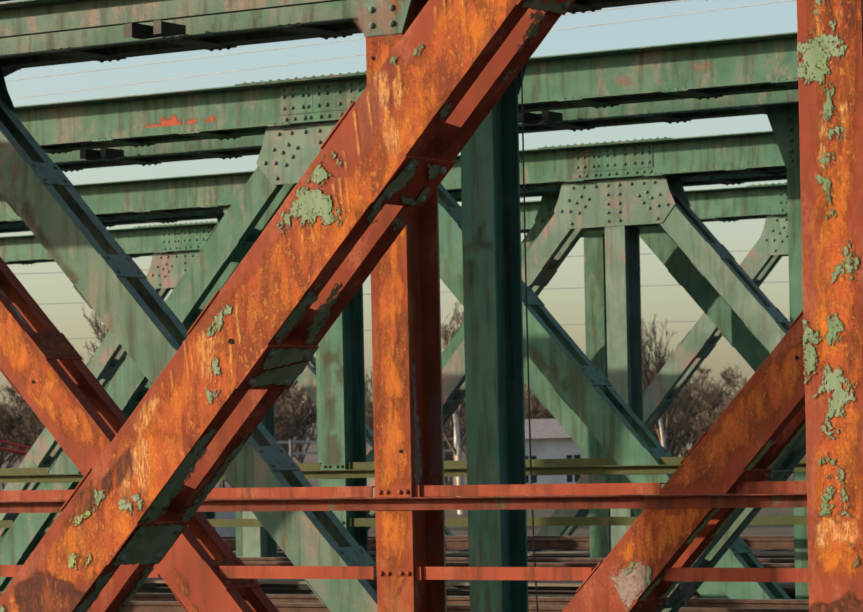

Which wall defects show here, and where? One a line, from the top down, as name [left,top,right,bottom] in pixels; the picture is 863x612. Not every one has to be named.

peeling [797,0,848,220]
peeling [276,151,349,234]
rust [0,0,516,612]
rust [808,0,863,576]
peeling [827,240,861,284]
rust [666,342,804,490]
peeling [802,309,858,441]
peeling [66,428,254,612]
peeling [609,560,681,612]
peeling [818,452,852,530]
rust [809,592,863,612]